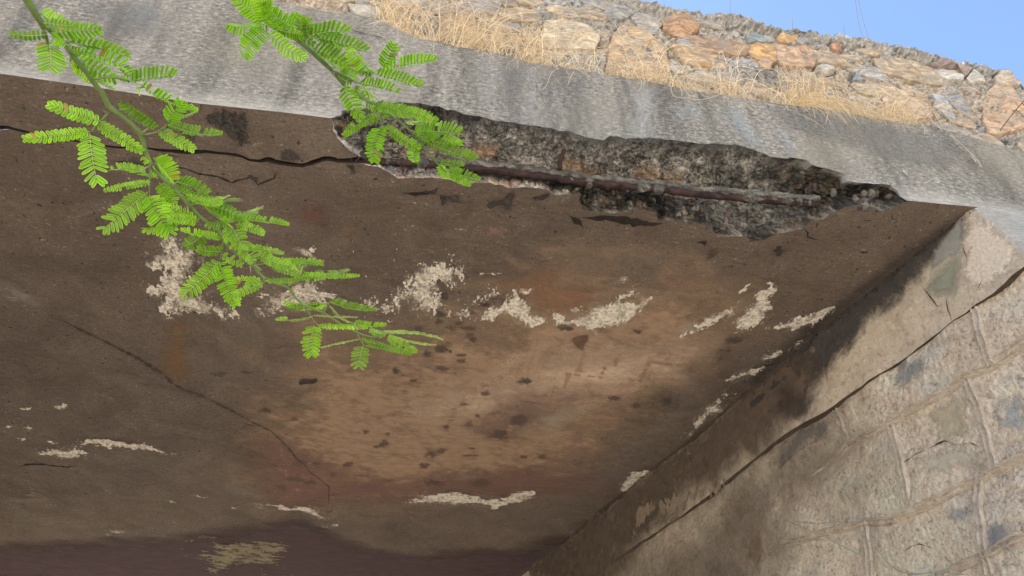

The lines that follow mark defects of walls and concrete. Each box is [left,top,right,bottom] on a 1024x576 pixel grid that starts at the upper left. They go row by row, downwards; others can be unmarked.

crack [0,126,367,185]
spalling [331,103,905,259]
peeling [256,281,347,317]
peeling [360,252,653,351]
crack [64,321,330,502]
leakage [0,215,966,576]
crack [904,440,980,462]